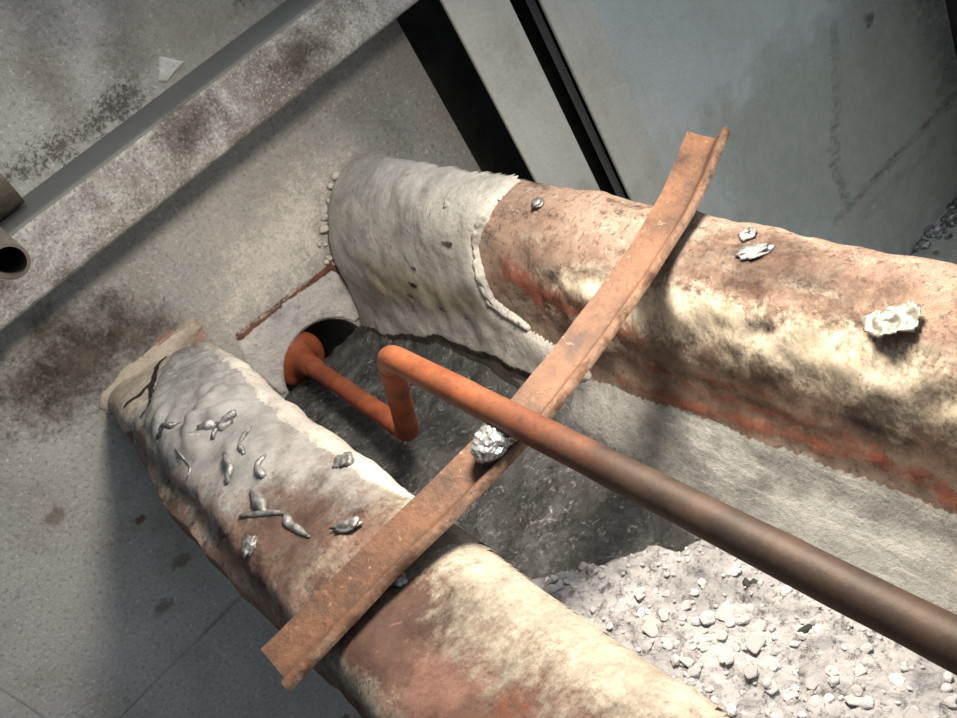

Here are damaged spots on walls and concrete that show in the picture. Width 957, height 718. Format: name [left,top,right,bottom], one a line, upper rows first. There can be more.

crack [123,356,167,419]
corrosion [618,376,915,468]